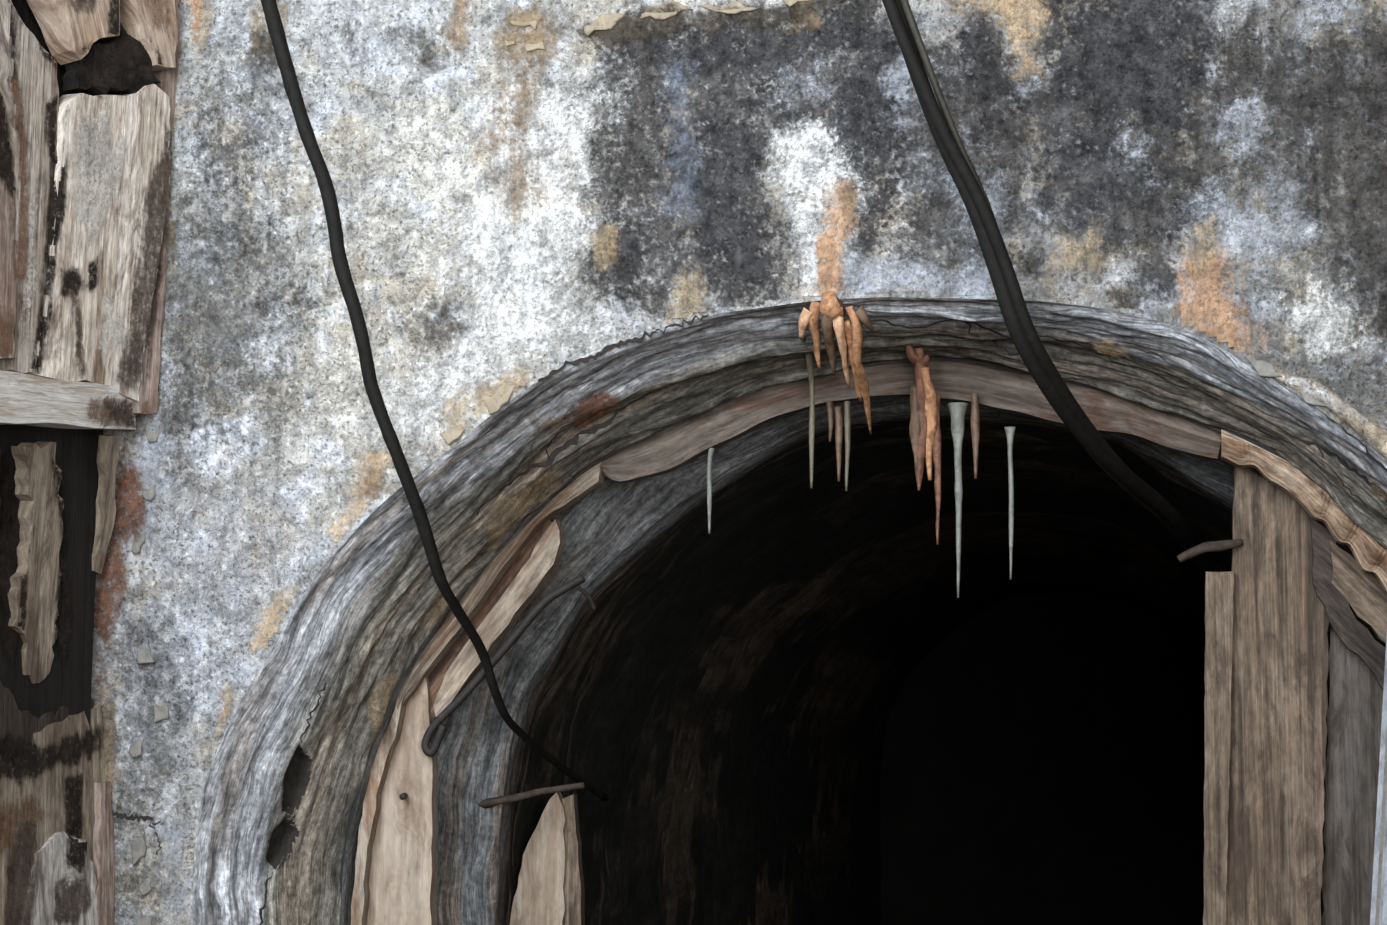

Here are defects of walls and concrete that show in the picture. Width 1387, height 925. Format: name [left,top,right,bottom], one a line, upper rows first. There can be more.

rust [813,179,856,294]
damp [360,0,1387,457]
rust [1177,217,1250,351]
rust [94,448,145,649]
rust [98,676,118,802]